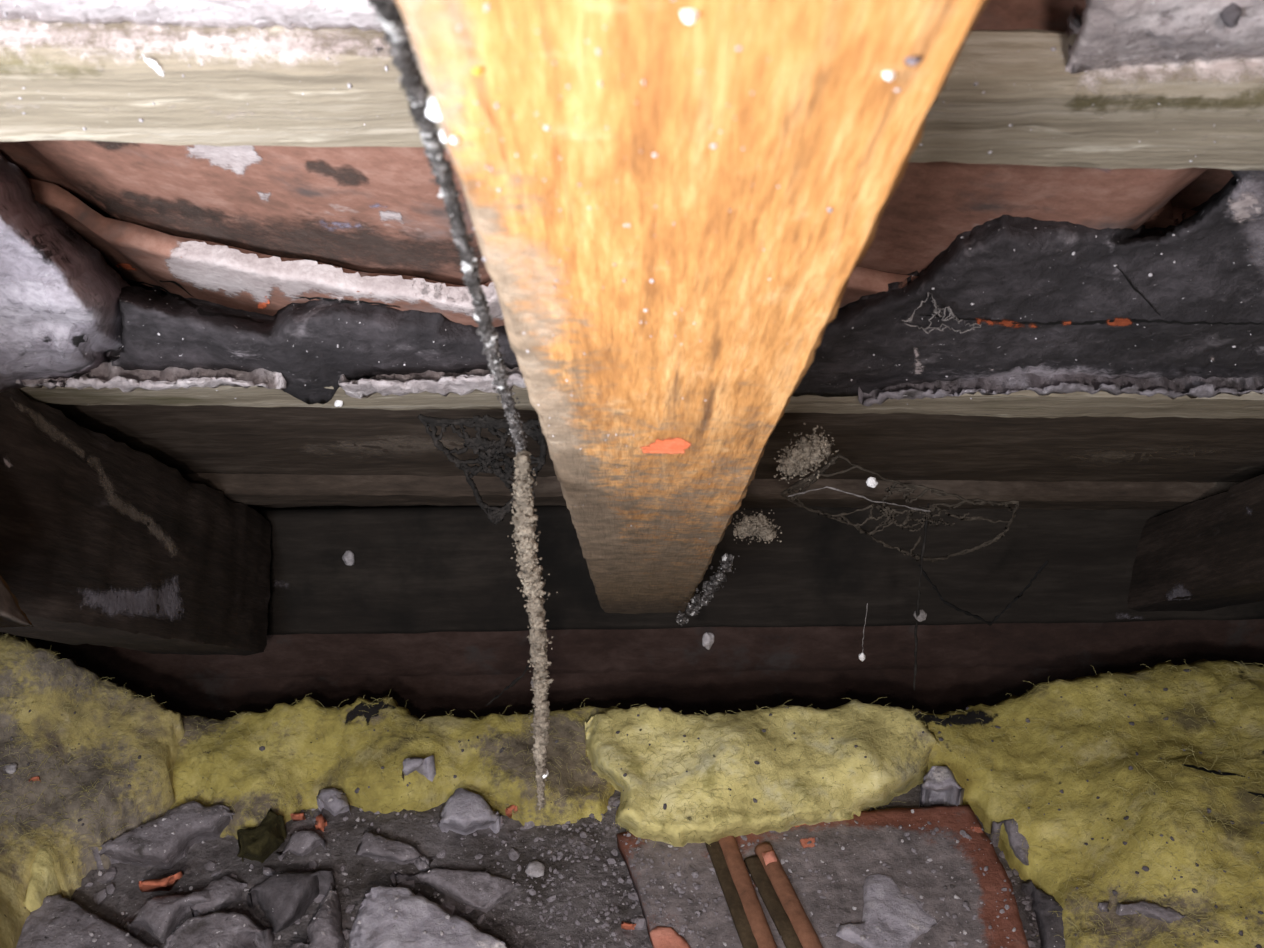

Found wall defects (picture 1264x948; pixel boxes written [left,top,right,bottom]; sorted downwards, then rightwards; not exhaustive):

crack [921,265,1264,325]